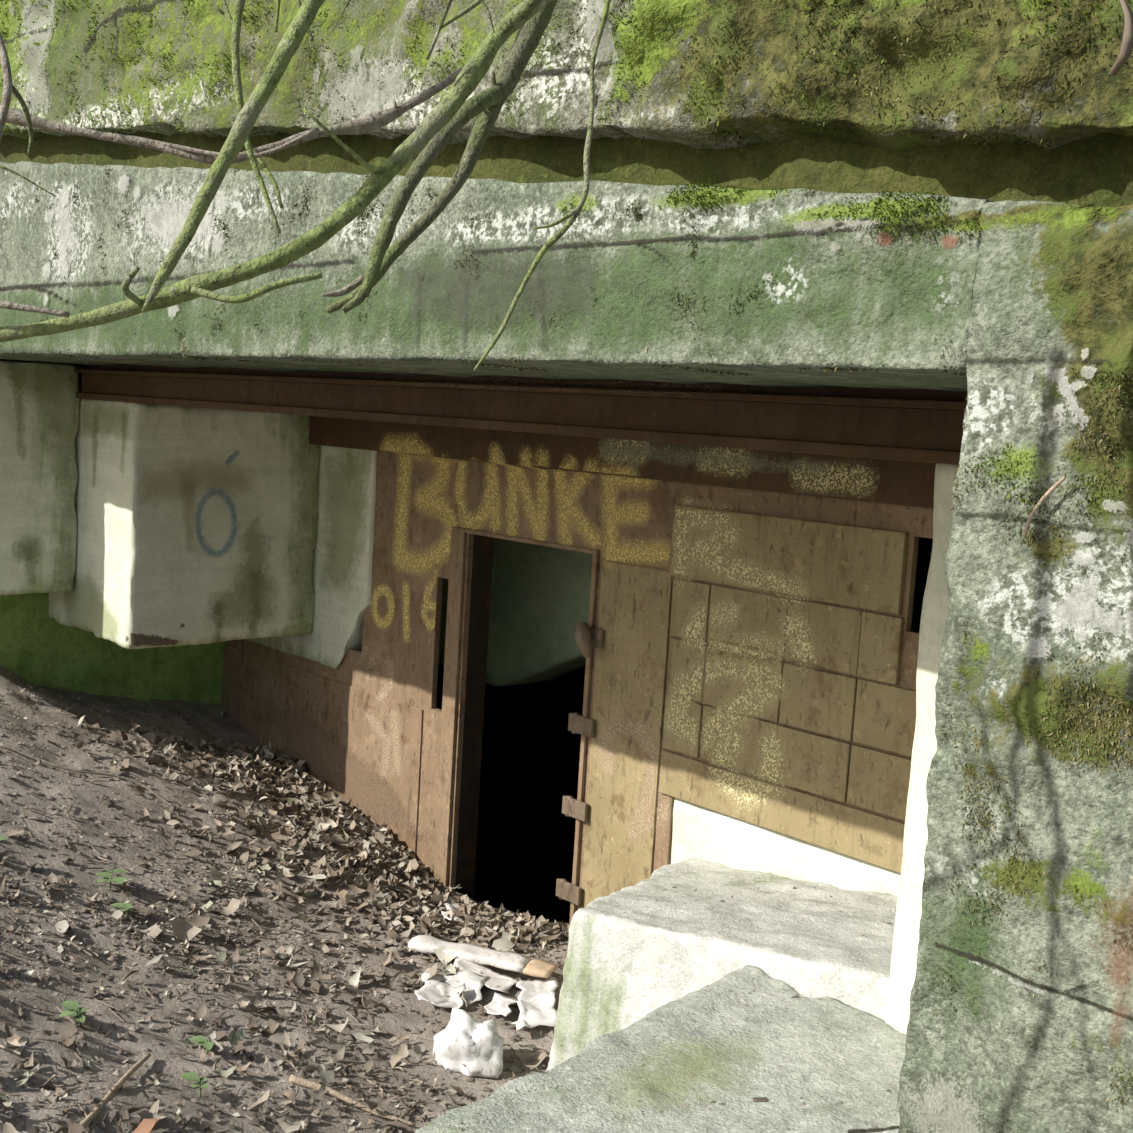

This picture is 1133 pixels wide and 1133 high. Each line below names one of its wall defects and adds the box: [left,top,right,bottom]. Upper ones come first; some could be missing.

crack [934,942,1133,1020]